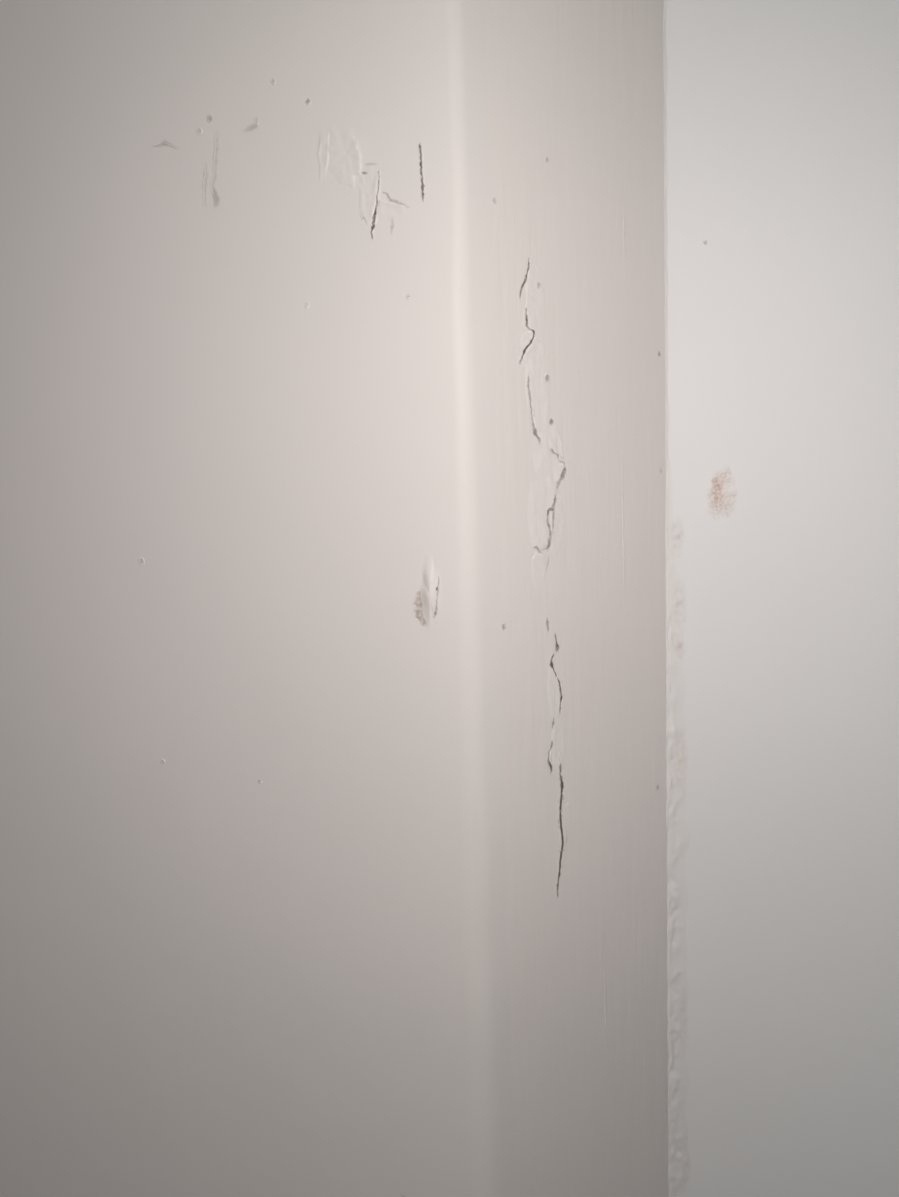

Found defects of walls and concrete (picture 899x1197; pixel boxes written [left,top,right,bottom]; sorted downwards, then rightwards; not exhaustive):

crack [371,142,426,240]
crack [517,258,546,367]
crack [547,639,571,899]